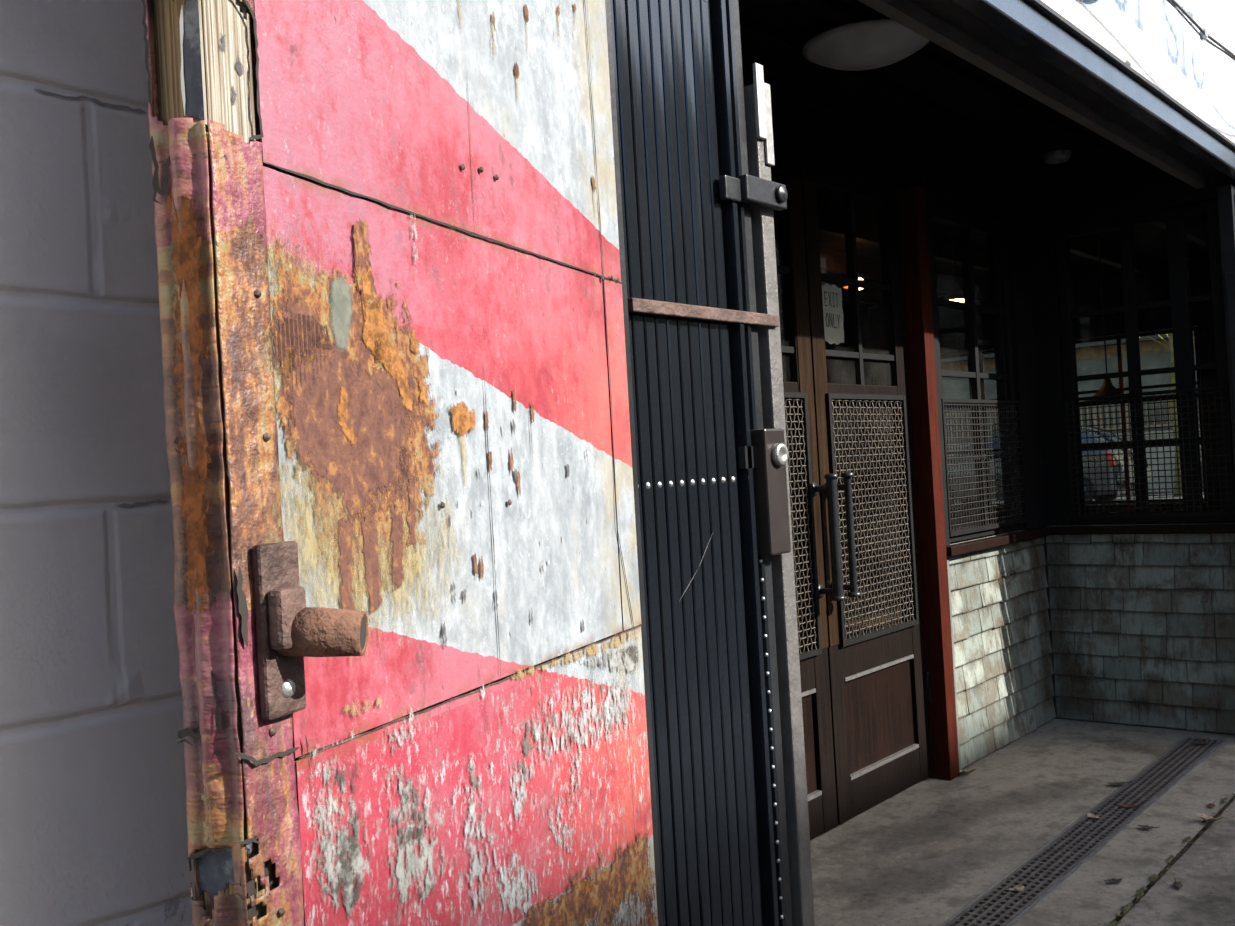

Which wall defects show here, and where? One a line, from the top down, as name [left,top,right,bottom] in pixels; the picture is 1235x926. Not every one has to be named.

corrosion [165,191,214,613]
corrosion [252,219,476,623]
peeling [510,448,521,495]
peeling [512,390,534,433]
peeling [473,553,484,580]
peeling [310,732,371,918]
peeling [344,698,382,716]
peeling [385,713,538,918]
peeling [510,631,639,859]
corrosion [524,832,659,926]